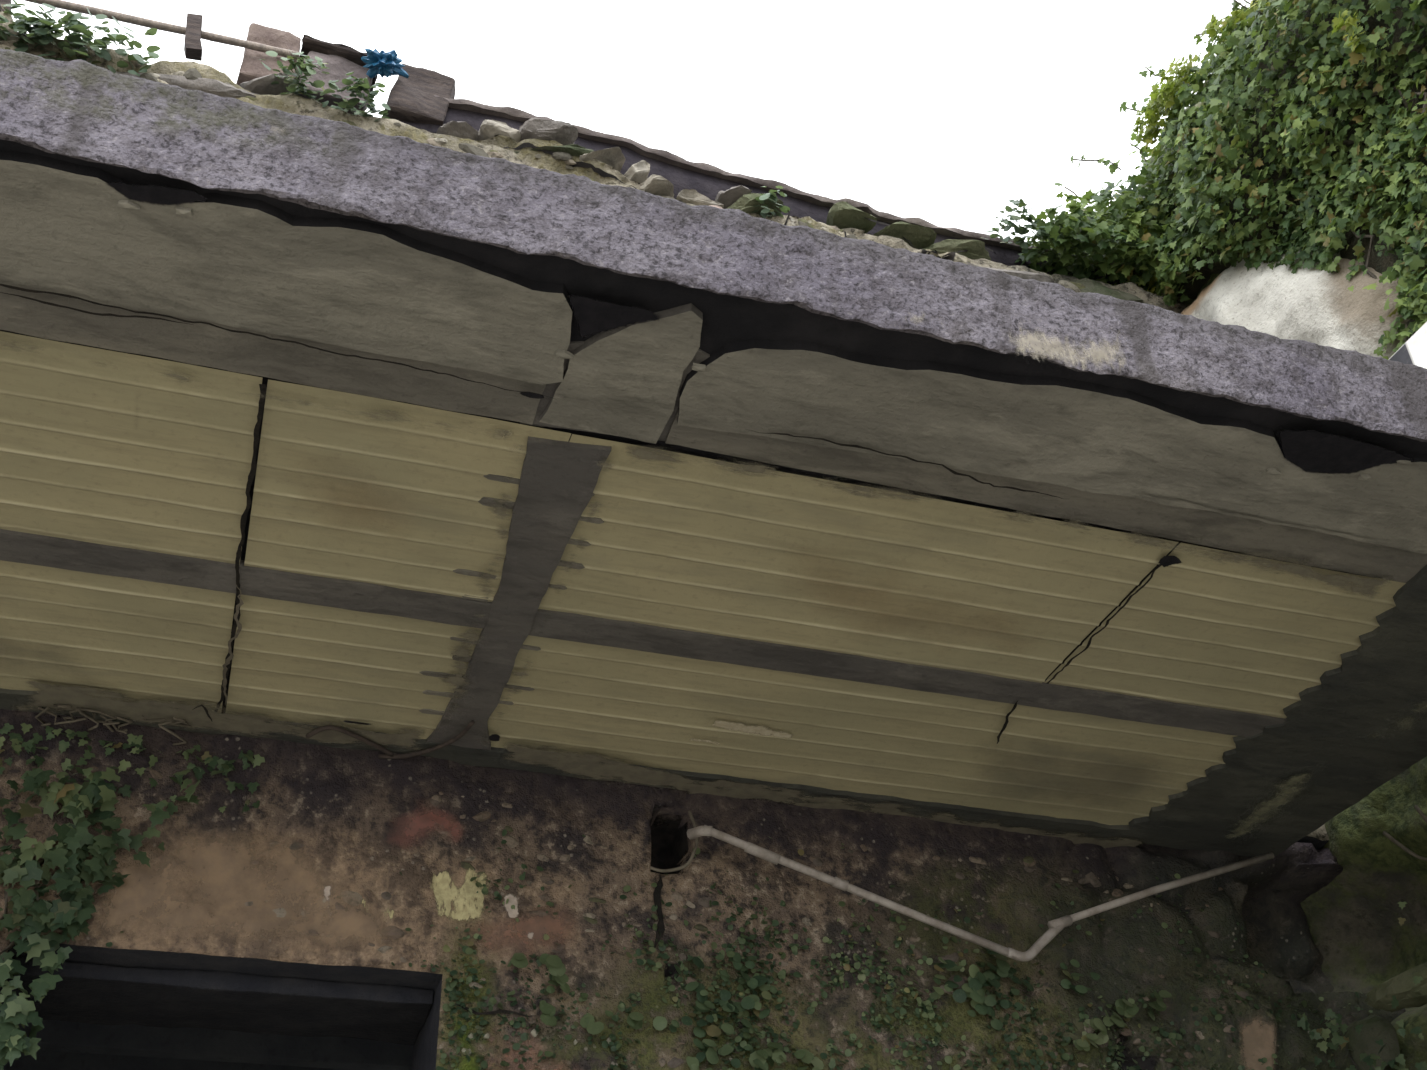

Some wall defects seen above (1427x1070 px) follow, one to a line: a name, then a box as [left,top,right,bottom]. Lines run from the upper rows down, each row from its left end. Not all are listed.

crack [0,284,557,400]
crack [192,384,266,721]
crack [1047,564,1162,684]
crack [997,701,1018,744]